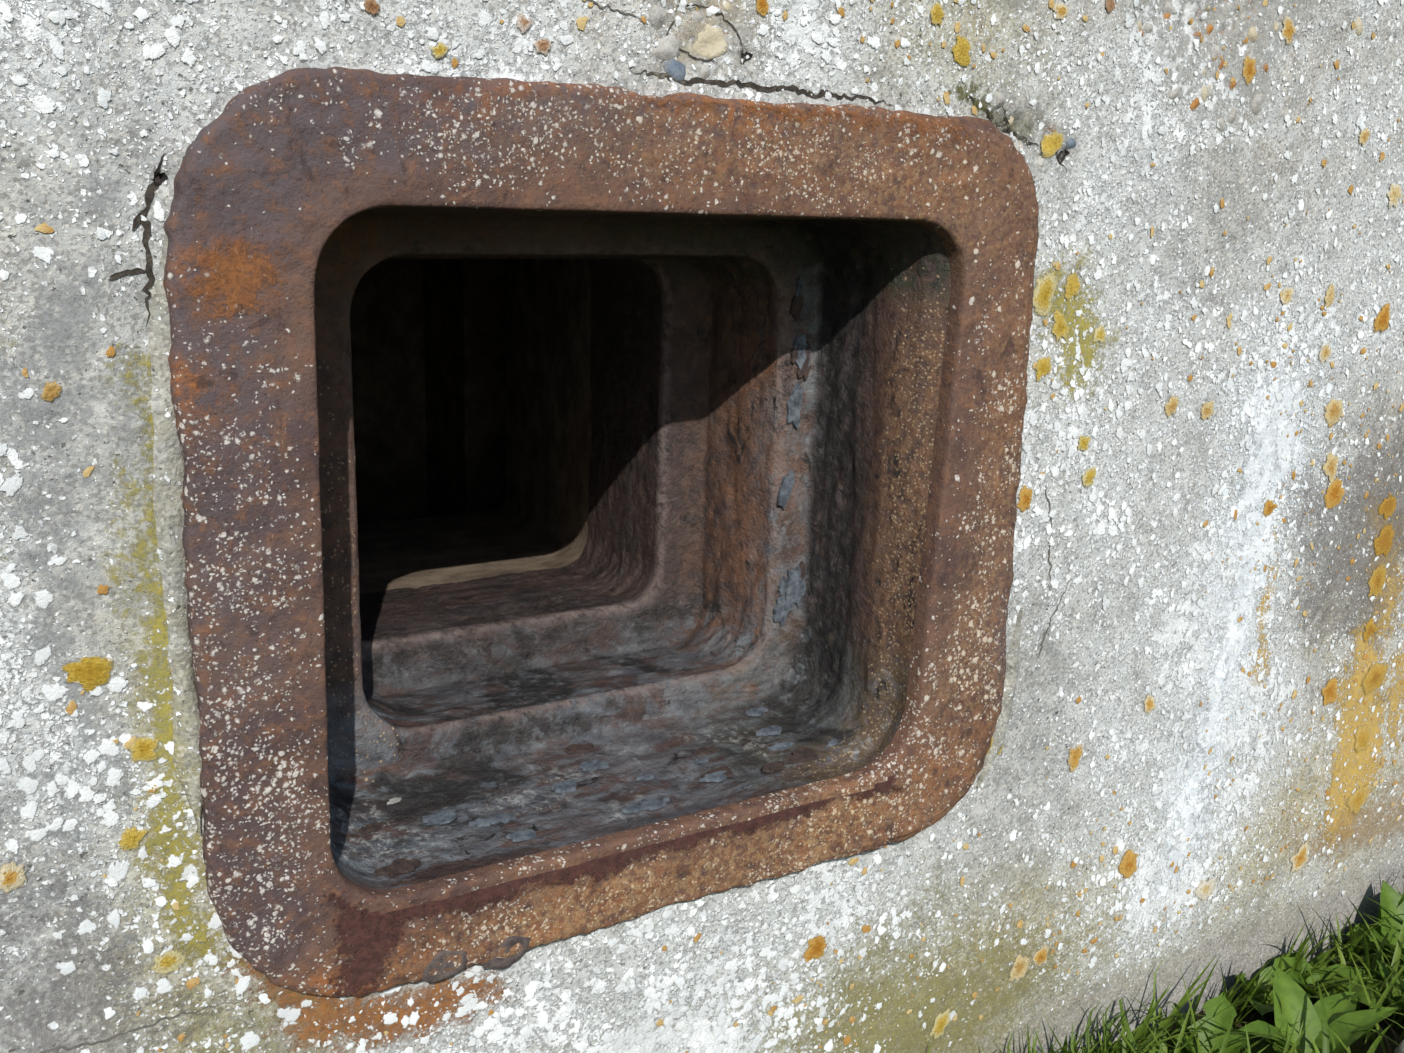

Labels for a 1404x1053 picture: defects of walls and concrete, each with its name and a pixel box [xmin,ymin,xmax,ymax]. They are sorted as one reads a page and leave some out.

crack [589,0,906,106]
corrosion [646,96,968,140]
crack [108,153,166,325]
corrosion [187,239,280,321]
corrosion [222,771,904,1053]